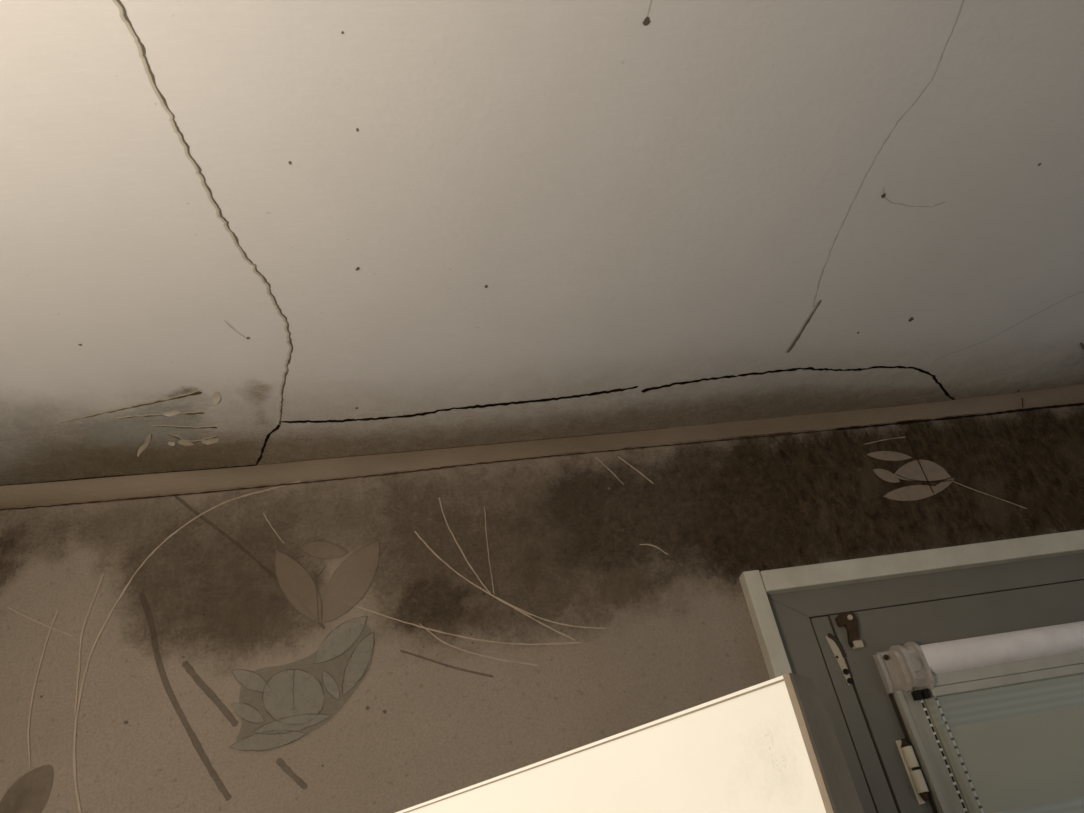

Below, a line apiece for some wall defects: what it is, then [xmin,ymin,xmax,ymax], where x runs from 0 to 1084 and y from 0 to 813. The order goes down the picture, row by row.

crack [0,0,1084,510]
water stain [553,408,1084,599]